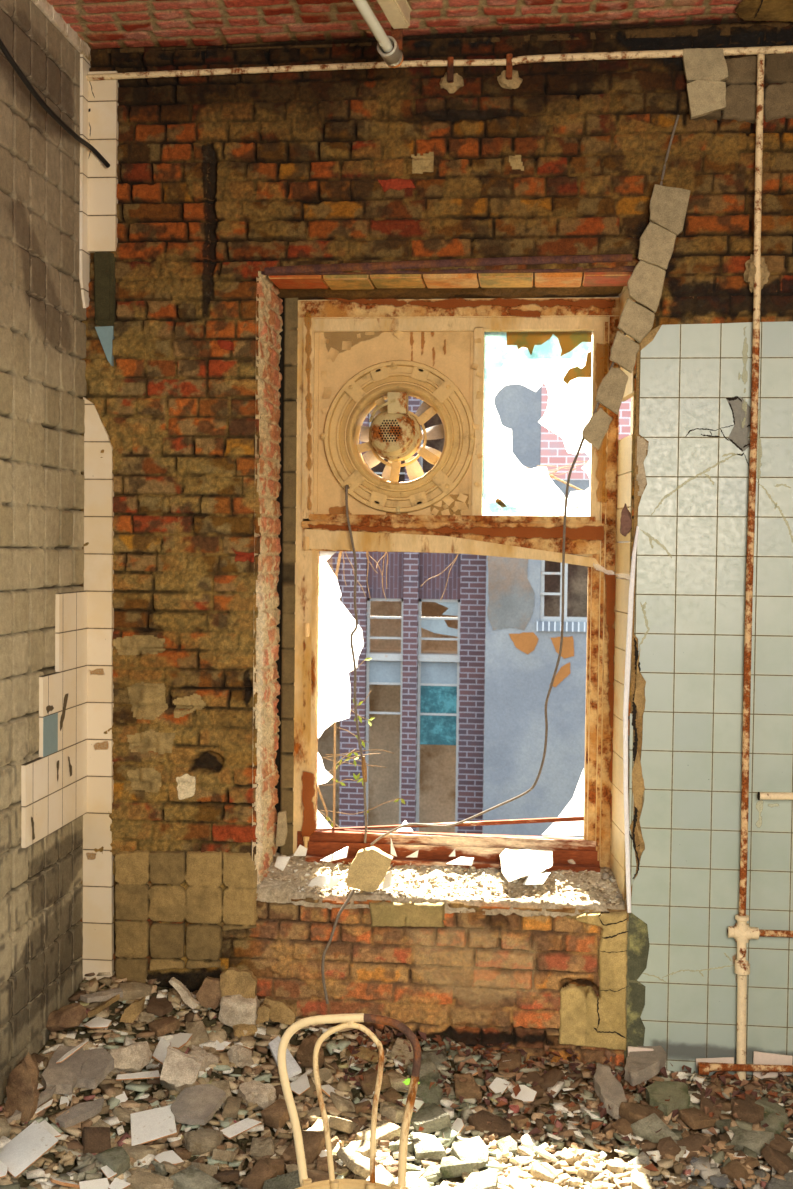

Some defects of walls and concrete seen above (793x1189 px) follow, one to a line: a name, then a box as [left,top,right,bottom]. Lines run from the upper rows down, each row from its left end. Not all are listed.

spalling [641,325,662,350]
spalling [686,396,751,466]
corrosion [605,573,616,829]
crack [598,911,629,953]
crack [594,986,629,1039]